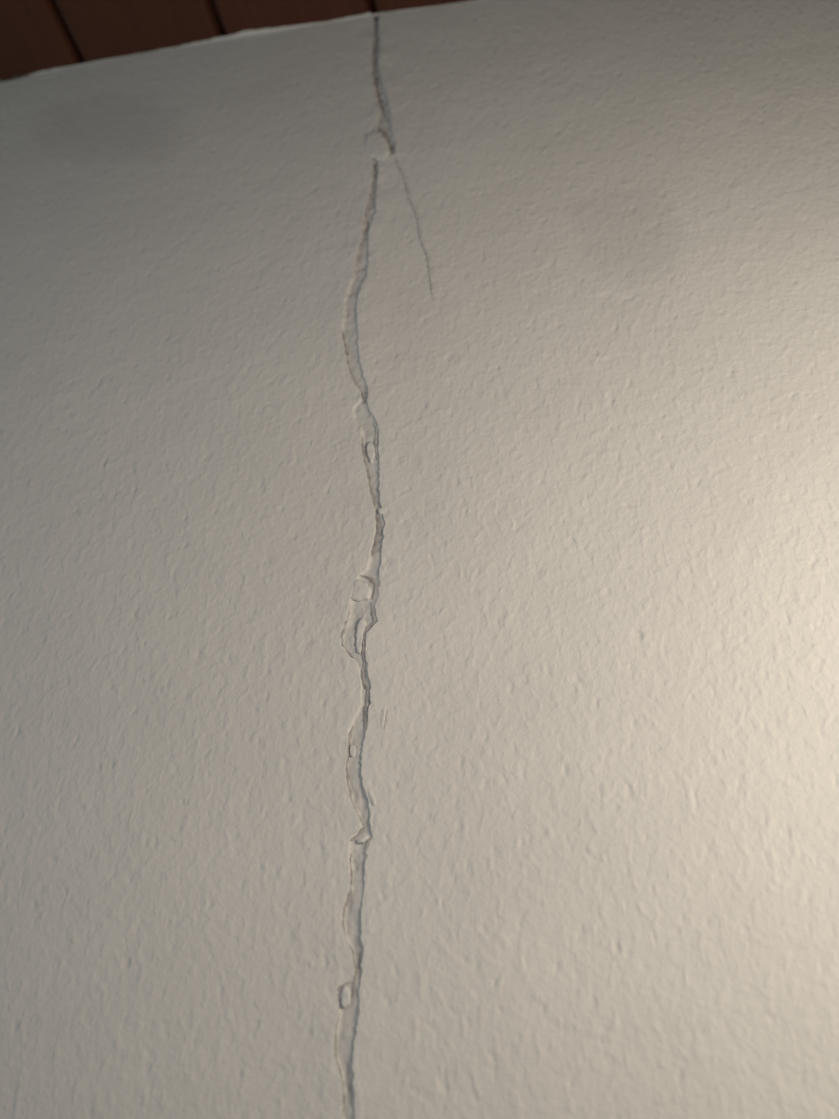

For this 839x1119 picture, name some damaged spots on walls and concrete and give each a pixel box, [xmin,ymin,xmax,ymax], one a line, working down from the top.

crack [333,12,434,1119]